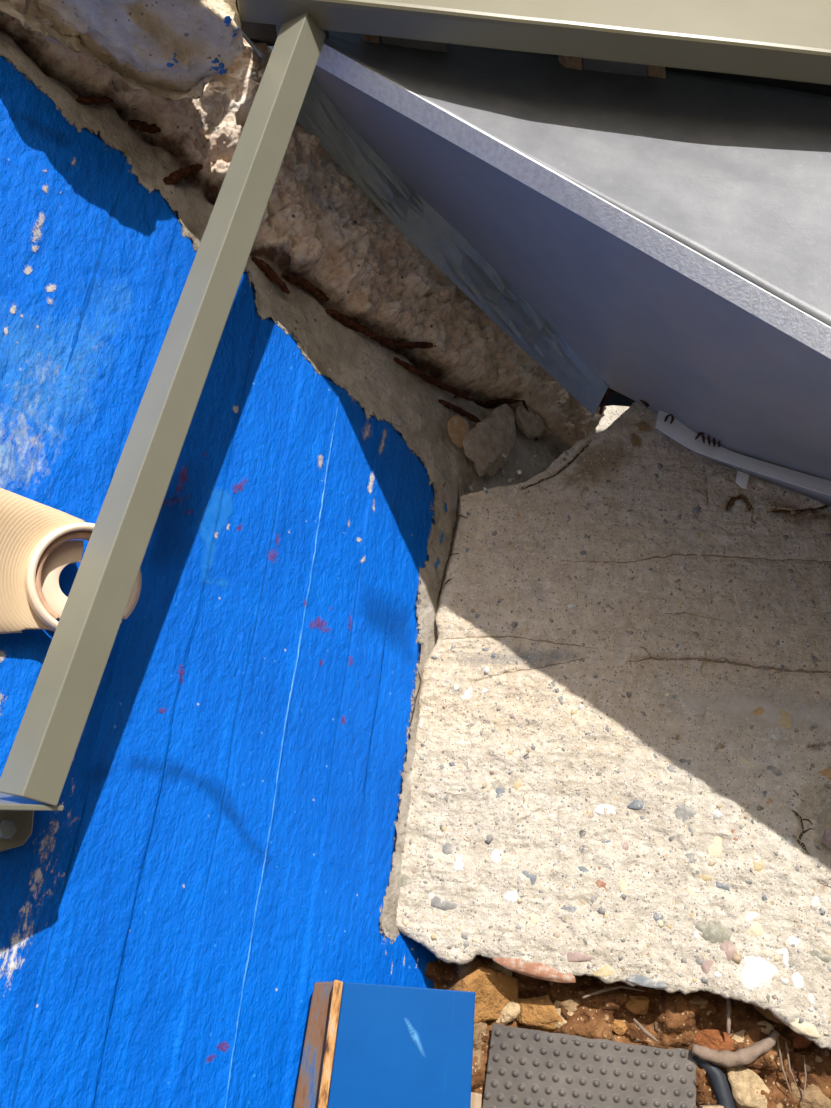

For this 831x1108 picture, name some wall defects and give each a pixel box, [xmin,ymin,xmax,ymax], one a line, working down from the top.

spalling [0,0,272,252]
peeling [0,399,43,484]
crack [435,490,467,614]
spalling [244,121,831,1038]
crack [565,554,831,564]
crack [442,635,597,682]
crack [631,647,831,677]
peeling [0,803,75,979]